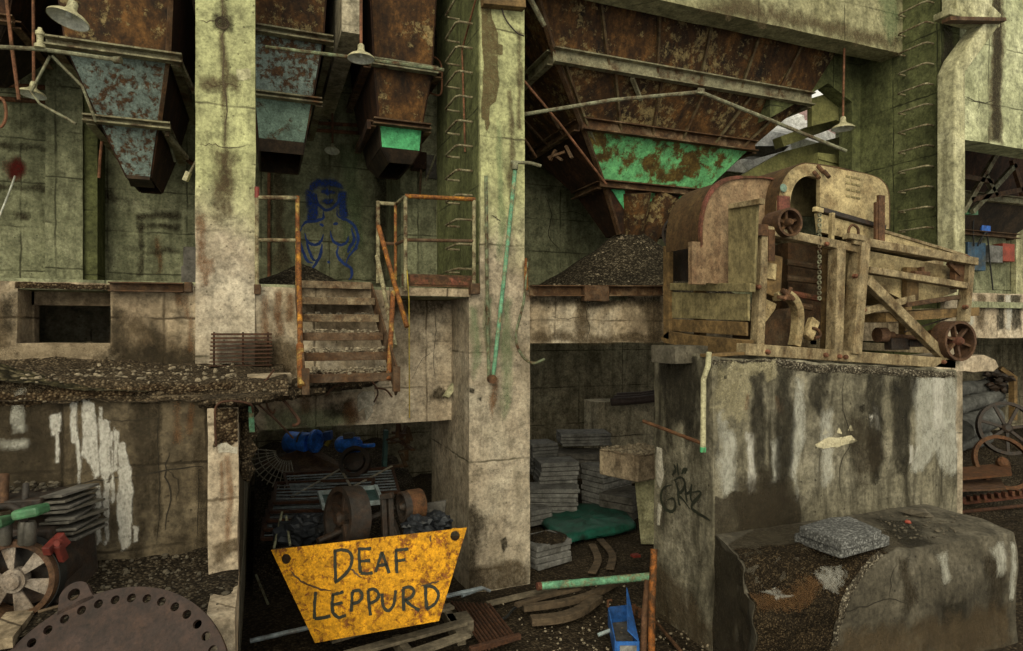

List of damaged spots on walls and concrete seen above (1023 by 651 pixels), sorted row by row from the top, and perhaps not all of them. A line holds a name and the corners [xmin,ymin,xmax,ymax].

leakage [201,0,238,215]
leakage [989,0,1006,141]
leakage [850,373,957,483]
spalling [733,542,888,651]